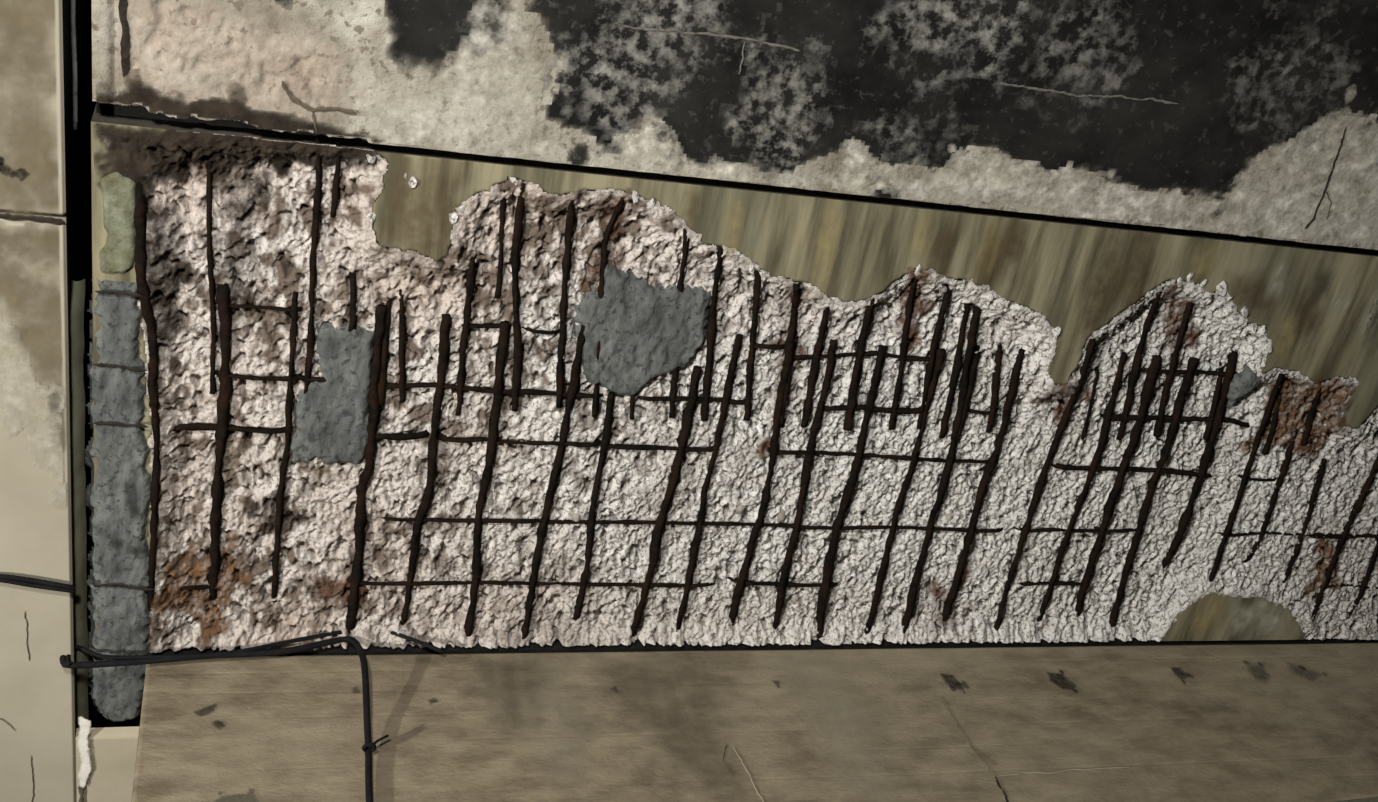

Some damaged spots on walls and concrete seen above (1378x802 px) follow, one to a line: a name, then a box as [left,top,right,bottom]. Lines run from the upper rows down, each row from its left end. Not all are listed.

damp [600,118,761,182]
damp [825,112,1378,246]
crack [1305,128,1346,229]
spalling [110,0,1378,653]
rust [1239,377,1354,457]
rust [243,489,306,537]
rust [153,534,250,648]
crack [23,613,31,659]
crack [0,718,34,802]
crack [722,745,764,802]
crack [941,697,1128,802]